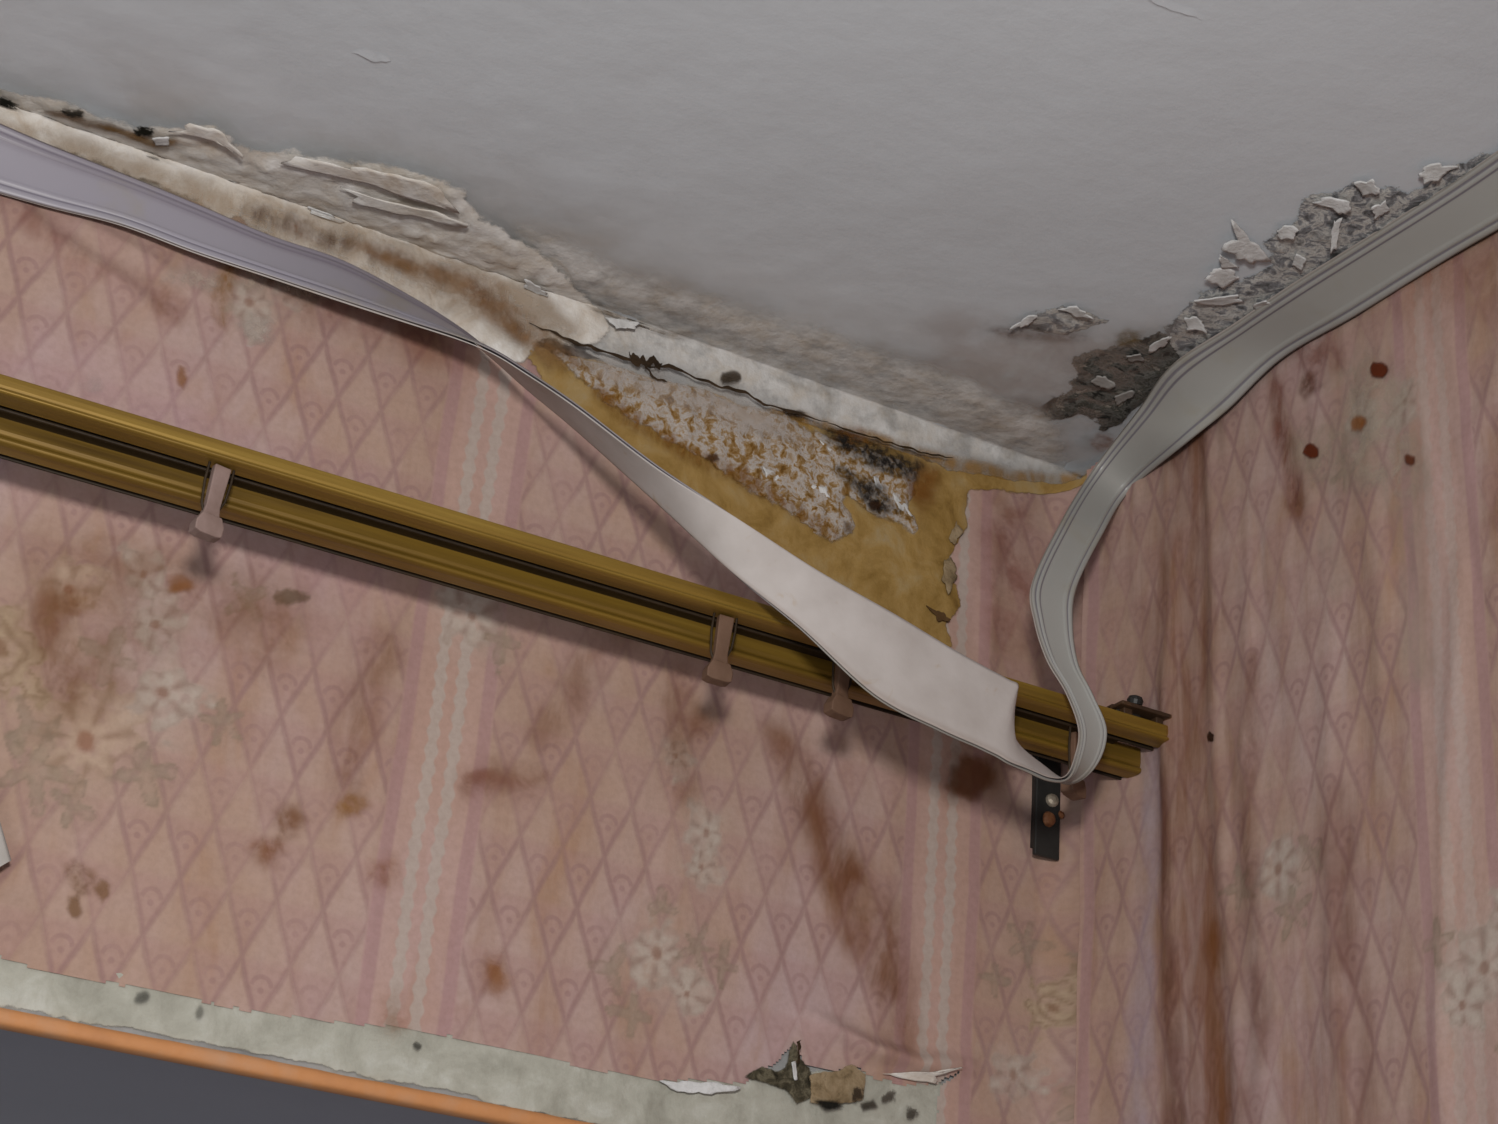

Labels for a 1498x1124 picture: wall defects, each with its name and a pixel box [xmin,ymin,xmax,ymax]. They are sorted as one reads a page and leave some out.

damp [721,371,741,383]
peeling [0,89,1491,647]
damp [826,430,933,513]
damp [951,758,991,797]
peeling [0,823,11,867]
peeling [0,955,963,1124]